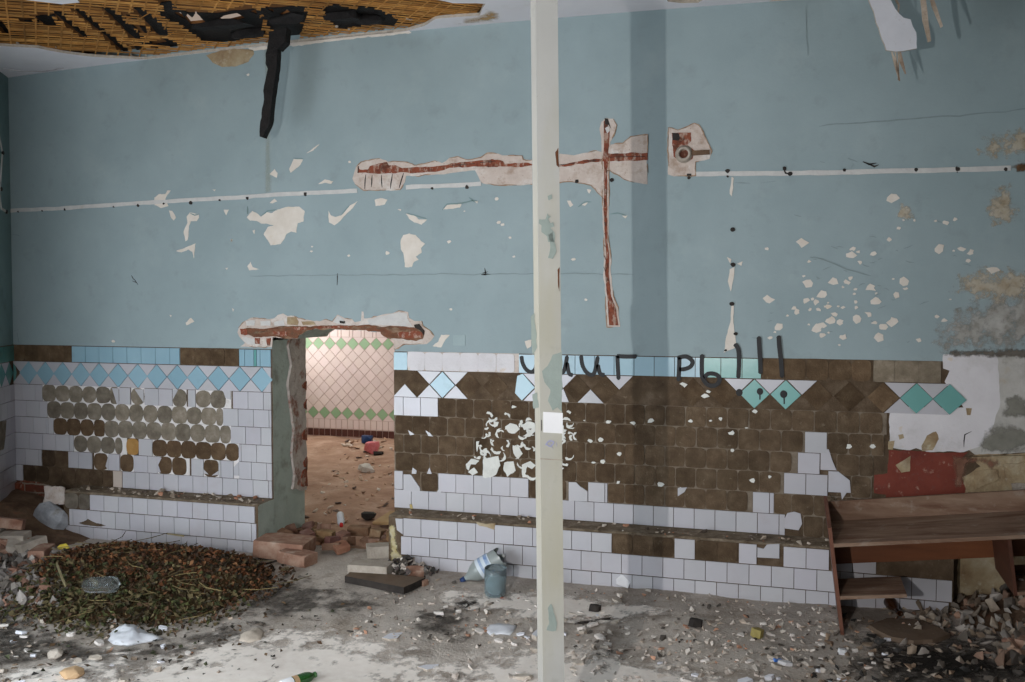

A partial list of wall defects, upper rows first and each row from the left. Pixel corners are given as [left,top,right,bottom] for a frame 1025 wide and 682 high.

peeling [270,145,319,178]
spalling [667,123,712,177]
peeling [154,190,199,257]
peeling [247,199,305,245]
peeling [328,184,403,225]
peeling [386,209,426,267]
spalling [539,214,556,259]
peeling [768,275,898,346]
peeling [181,316,1025,538]
peeling [15,385,239,526]
peeling [613,533,675,558]
peeling [695,540,737,563]